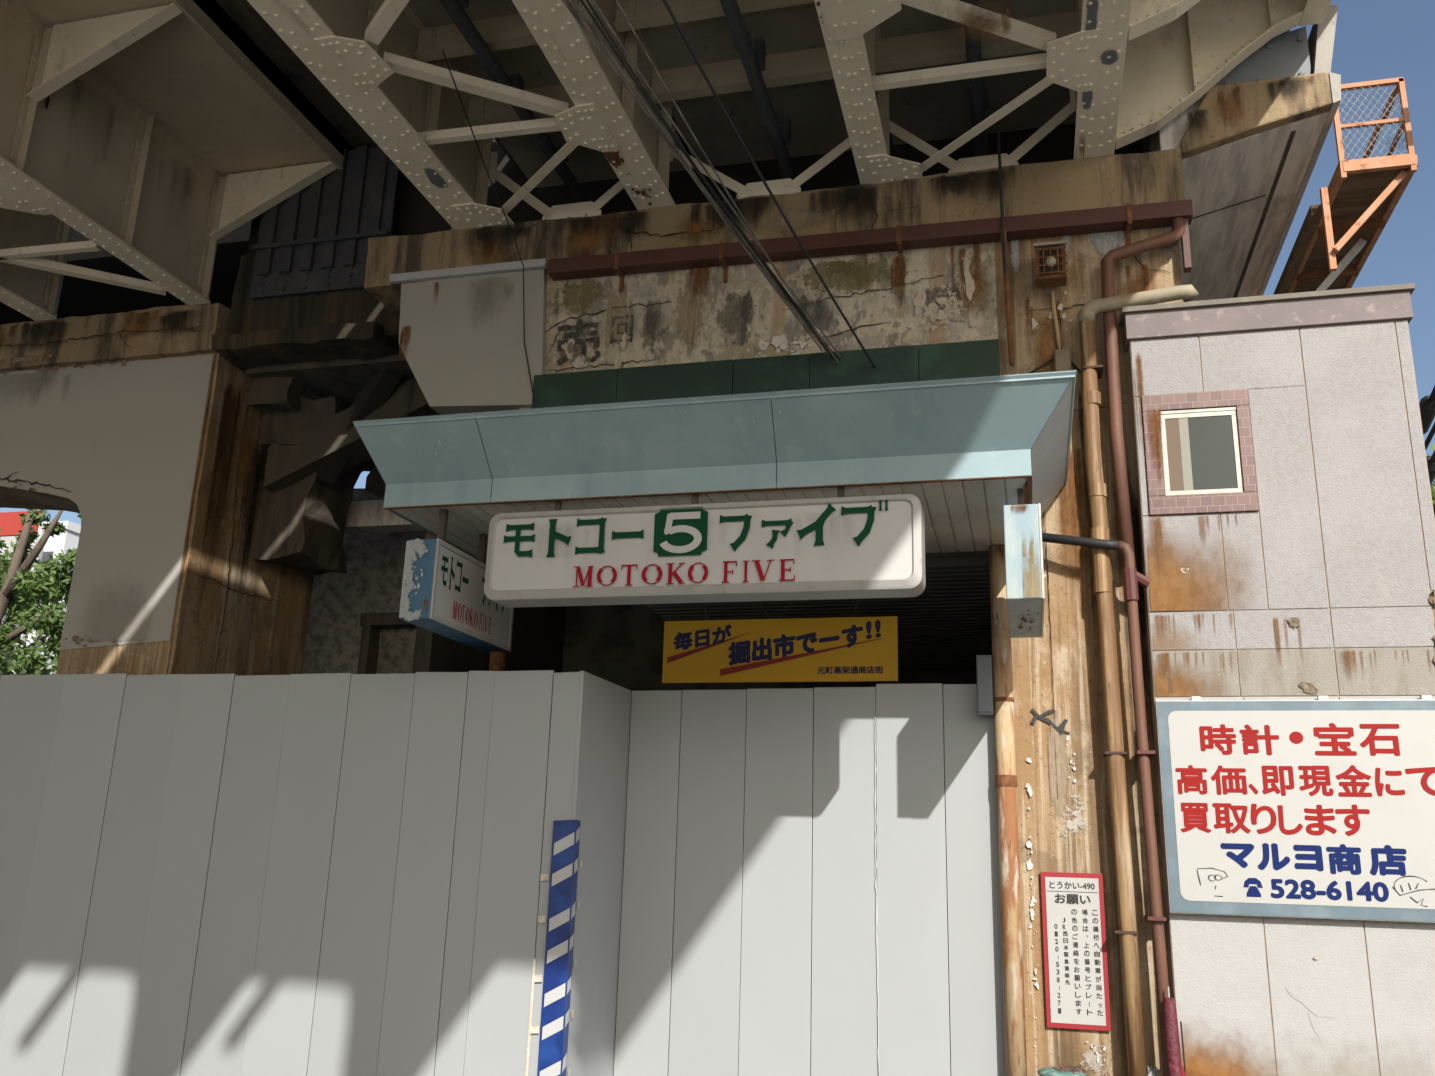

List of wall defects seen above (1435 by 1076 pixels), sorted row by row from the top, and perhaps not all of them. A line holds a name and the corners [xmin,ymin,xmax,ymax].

damp [571,212,645,237]
damp [693,185,876,234]
rust [951,243,986,306]
crack [781,275,942,341]
peeling [894,254,980,346]
damp [4,321,65,365]
peeling [550,334,578,364]
peeling [746,329,829,355]
crack [0,471,71,492]
rust [1147,545,1223,611]
rust [1155,669,1202,697]
rust [1182,1047,1255,1076]